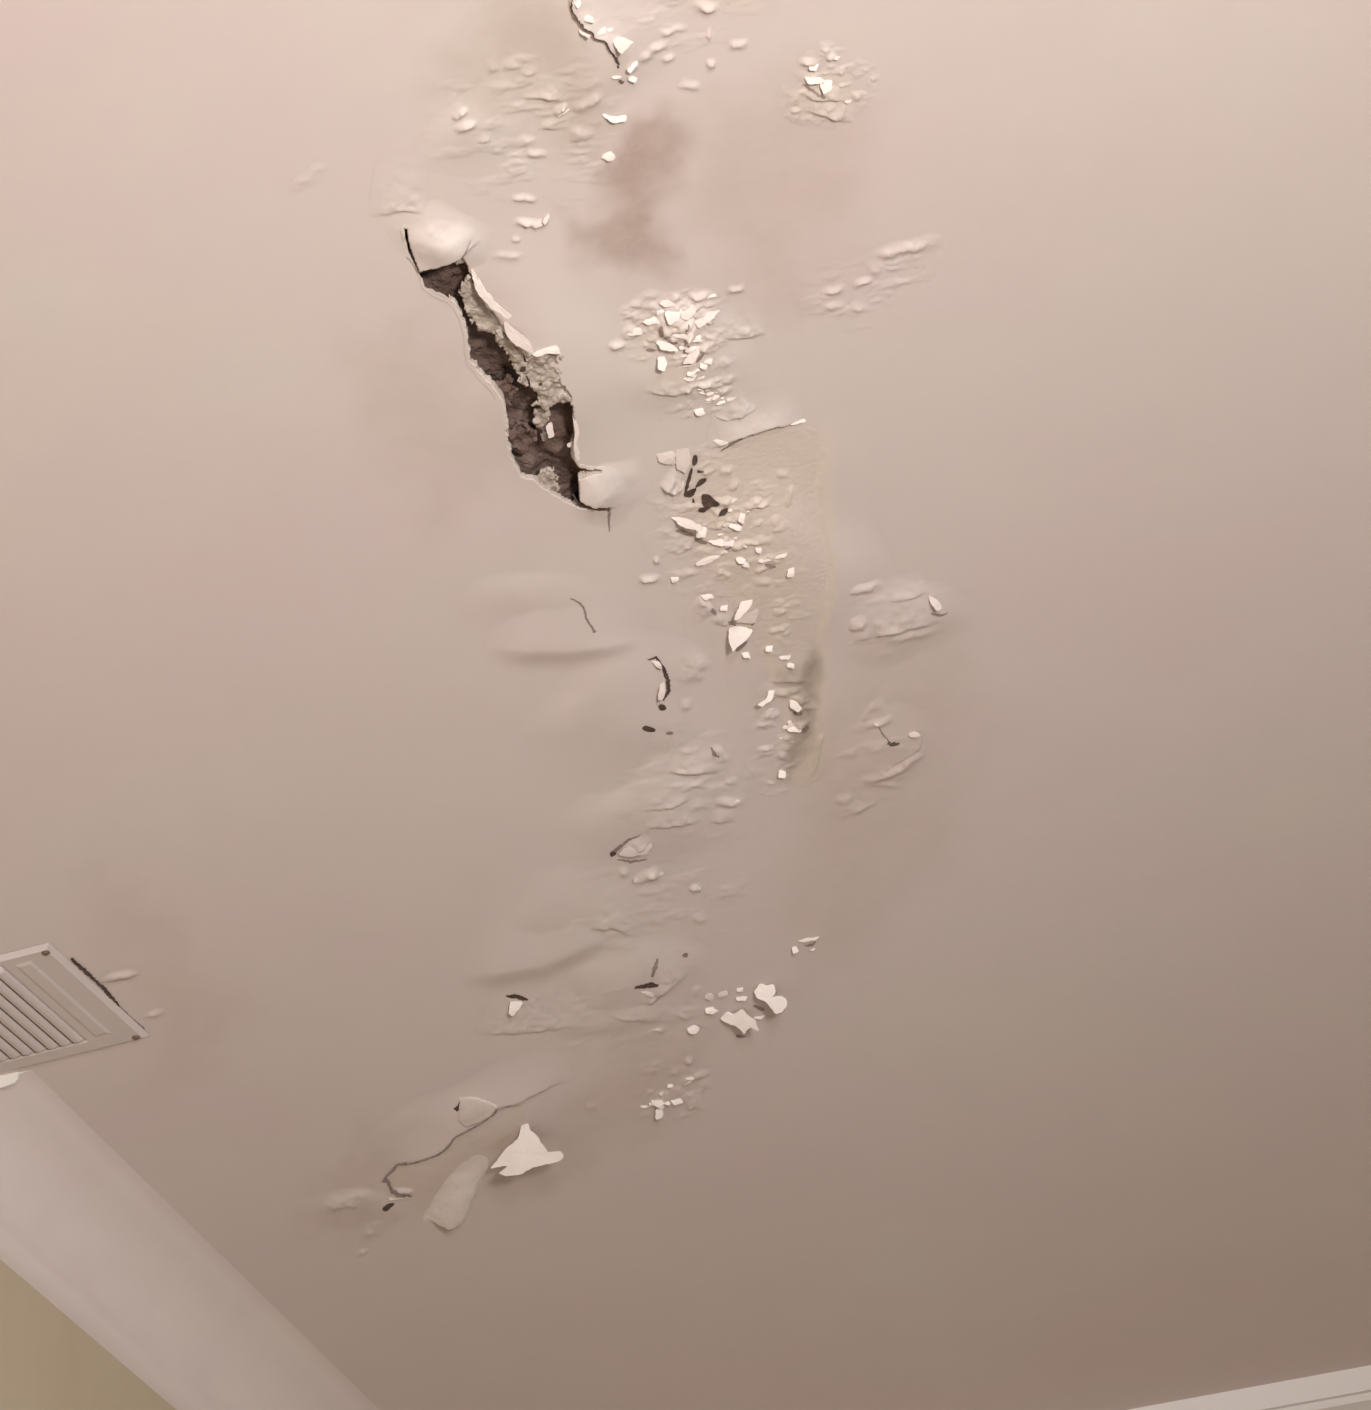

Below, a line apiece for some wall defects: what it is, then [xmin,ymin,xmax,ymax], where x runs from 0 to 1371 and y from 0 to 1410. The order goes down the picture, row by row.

peeling [777,39,882,130]
peeling [602,114,627,123]
crack [572,493,611,532]
peeling [606,282,887,797]
peeling [929,596,942,611]
peeling [619,843,653,857]
peeling [792,936,819,954]
peeling [506,994,528,1016]
peeling [687,984,787,1038]
peeling [629,1051,719,1138]
peeling [319,1050,574,1258]